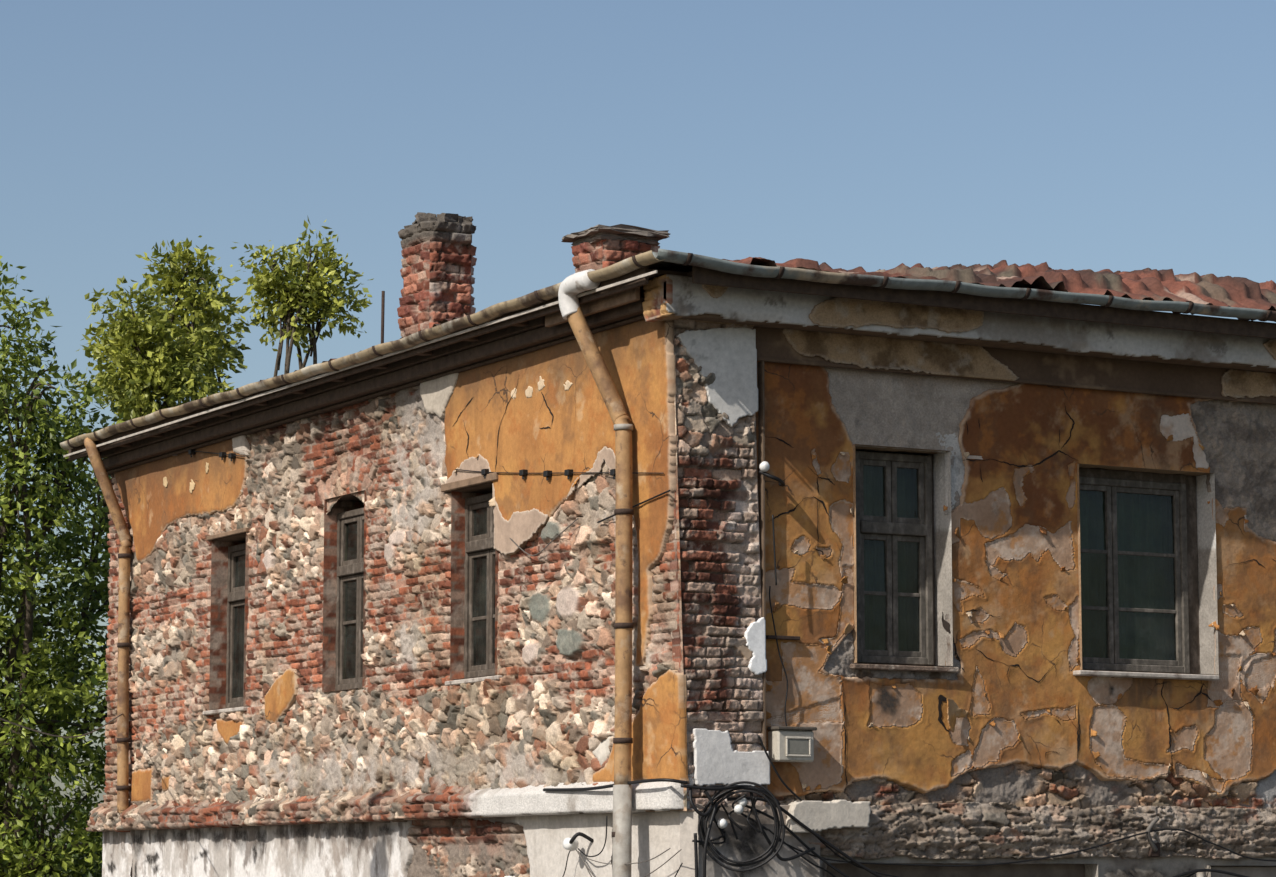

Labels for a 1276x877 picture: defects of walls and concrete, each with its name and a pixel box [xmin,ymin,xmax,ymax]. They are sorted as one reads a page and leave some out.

crack [453,377,553,470]
flaking render [783,297,1076,582]
flaking render [1160,339,1276,542]
flaking render [446,454,548,555]
crack [942,609,1054,683]
flaking render [765,499,1276,817]
crack [841,680,849,786]
crack [938,695,951,734]
crack [1045,701,1081,761]
leakage [134,832,184,851]
leakage [214,830,265,845]
flaking render [407,818,530,877]